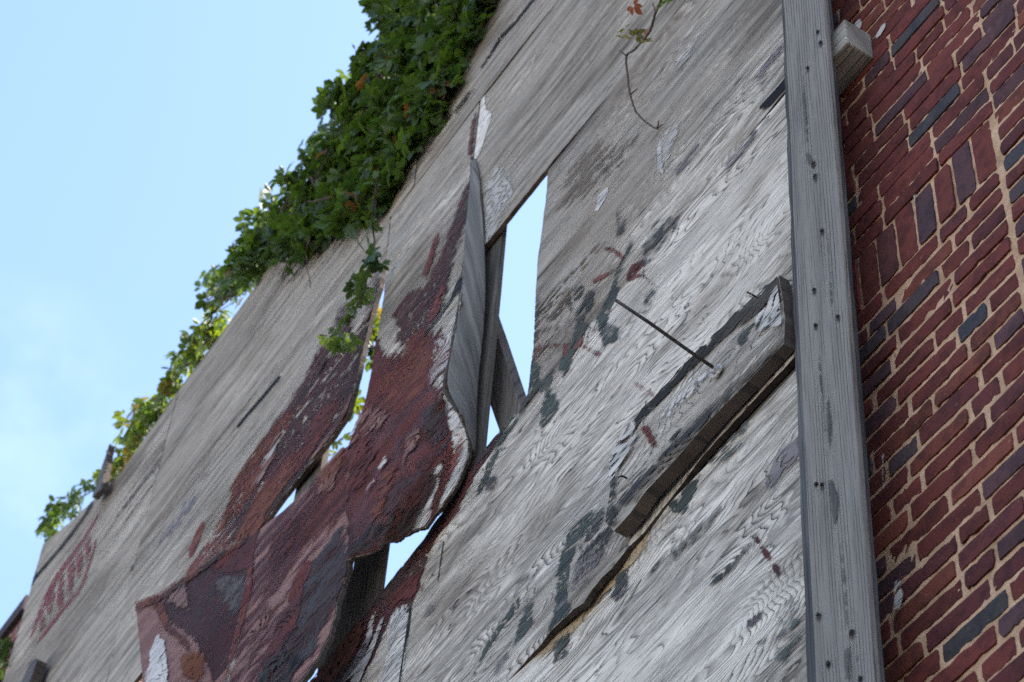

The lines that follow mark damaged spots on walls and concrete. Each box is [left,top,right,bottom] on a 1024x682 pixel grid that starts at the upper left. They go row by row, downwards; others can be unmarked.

peeling [724,129,756,169]
peeling [344,325,468,560]
peeling [134,530,260,682]
peeling [380,604,409,682]